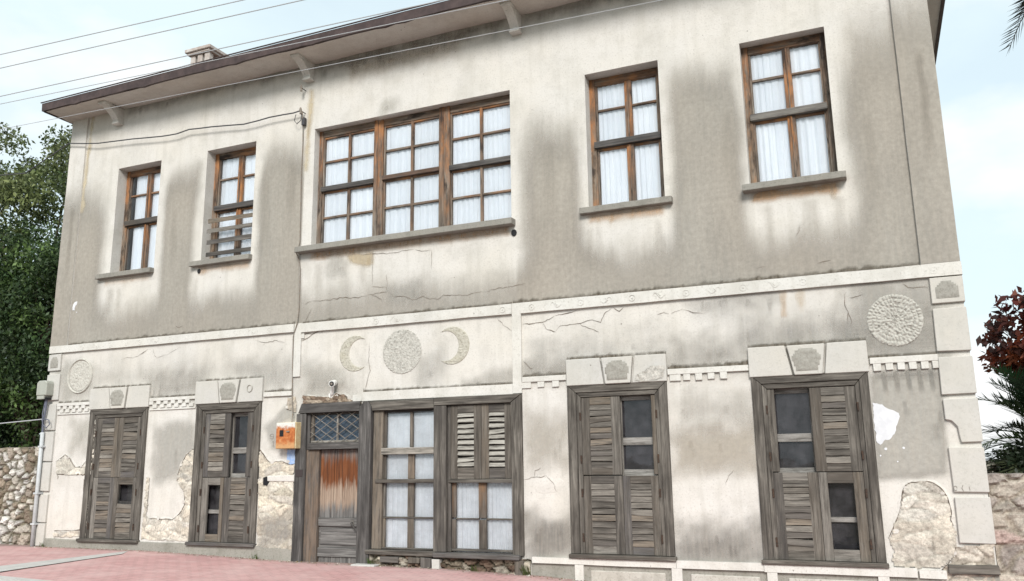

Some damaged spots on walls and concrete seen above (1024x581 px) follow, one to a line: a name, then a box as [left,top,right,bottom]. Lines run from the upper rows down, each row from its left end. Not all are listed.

leakage [50,14,960,369]
crack [302,249,525,341]
crack [497,308,623,332]
spalling [52,503,88,537]
spalling [56,423,96,488]
spalling [141,449,194,541]
spalling [256,448,294,549]
peeling [873,403,900,456]
spalling [887,478,996,581]